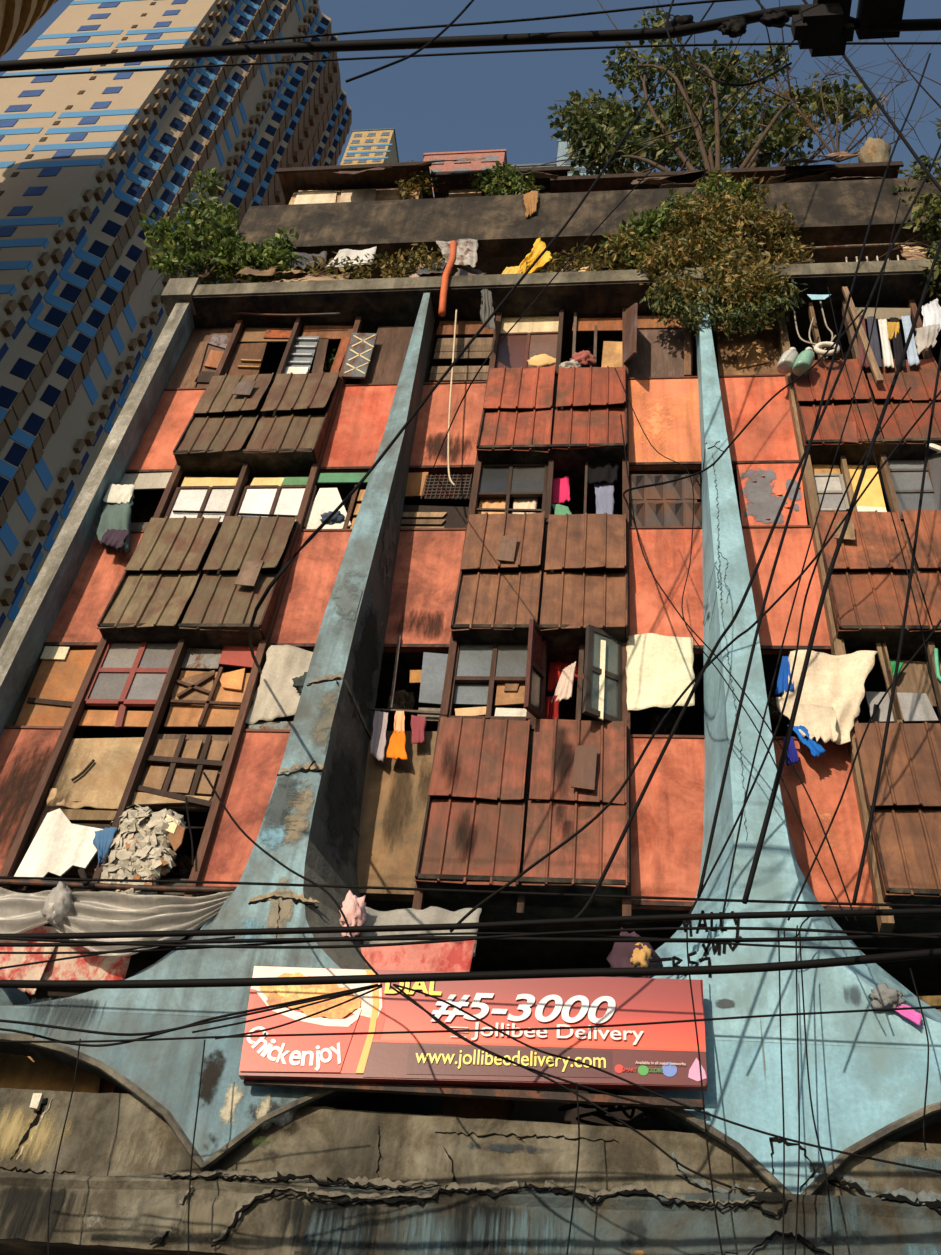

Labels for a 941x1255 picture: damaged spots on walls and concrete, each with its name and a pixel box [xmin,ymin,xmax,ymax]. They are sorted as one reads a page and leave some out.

peeling [740,468,801,524]
leakage [312,572,383,868]
peeling [277,761,326,844]
leakage [0,1185,76,1240]
crack [149,1130,941,1255]